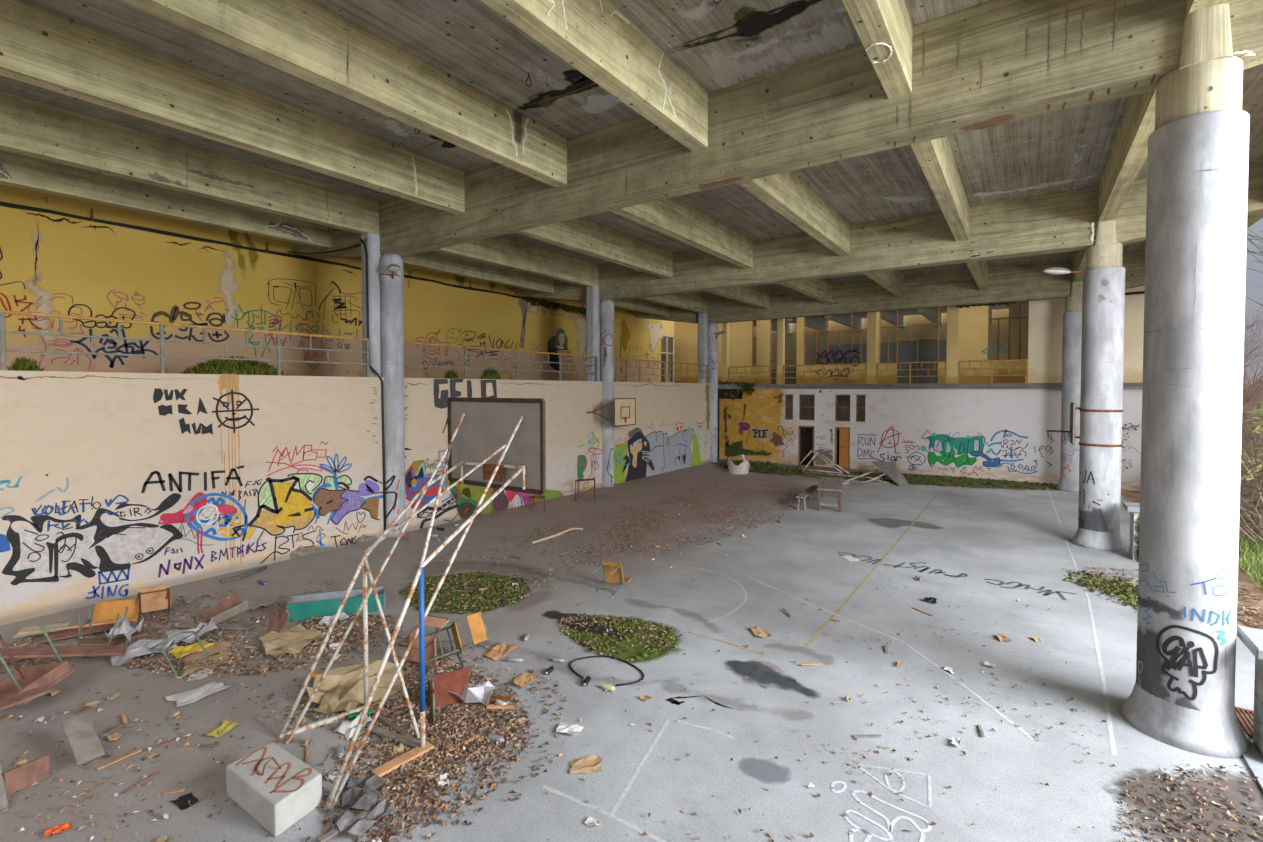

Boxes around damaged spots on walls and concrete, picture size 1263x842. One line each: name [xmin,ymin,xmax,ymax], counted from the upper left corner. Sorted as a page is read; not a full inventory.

corrosion [219,374,242,566]